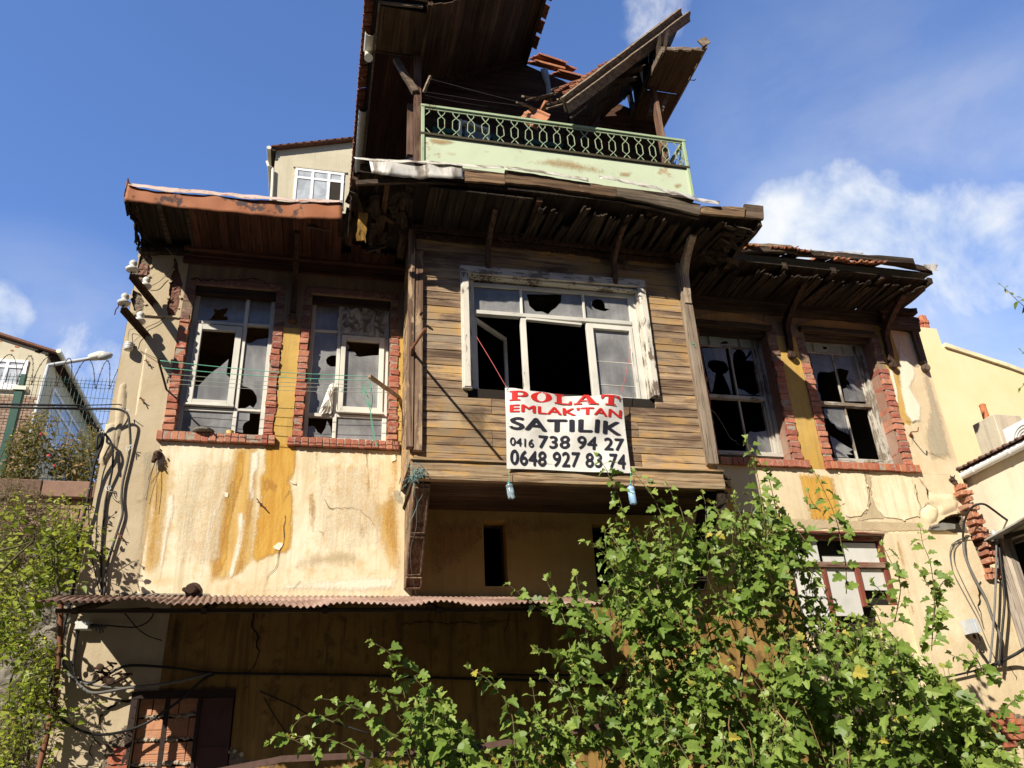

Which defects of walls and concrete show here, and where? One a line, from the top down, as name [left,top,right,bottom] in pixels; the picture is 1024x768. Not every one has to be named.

leakage [138,448,258,579]
leakage [282,469,402,591]